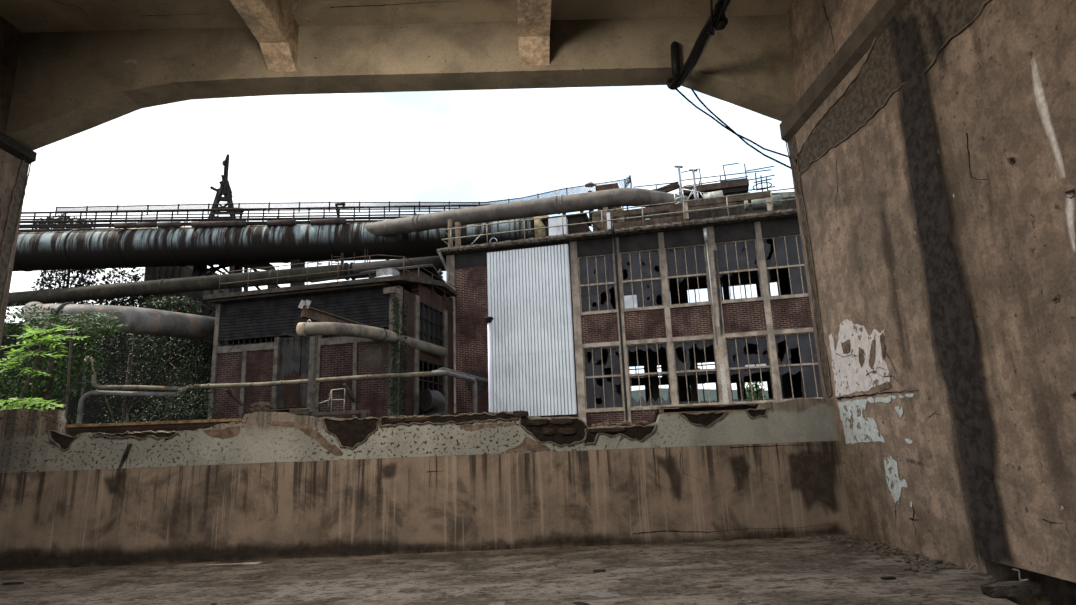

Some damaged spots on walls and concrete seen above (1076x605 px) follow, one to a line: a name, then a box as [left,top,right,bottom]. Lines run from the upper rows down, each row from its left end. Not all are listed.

flaking render [0,160,31,323]
spalling [268,410,657,456]
spalling [678,411,727,428]
damp [383,464,396,478]
damp [658,457,680,498]
damp [731,456,748,488]
peeling [884,456,912,507]